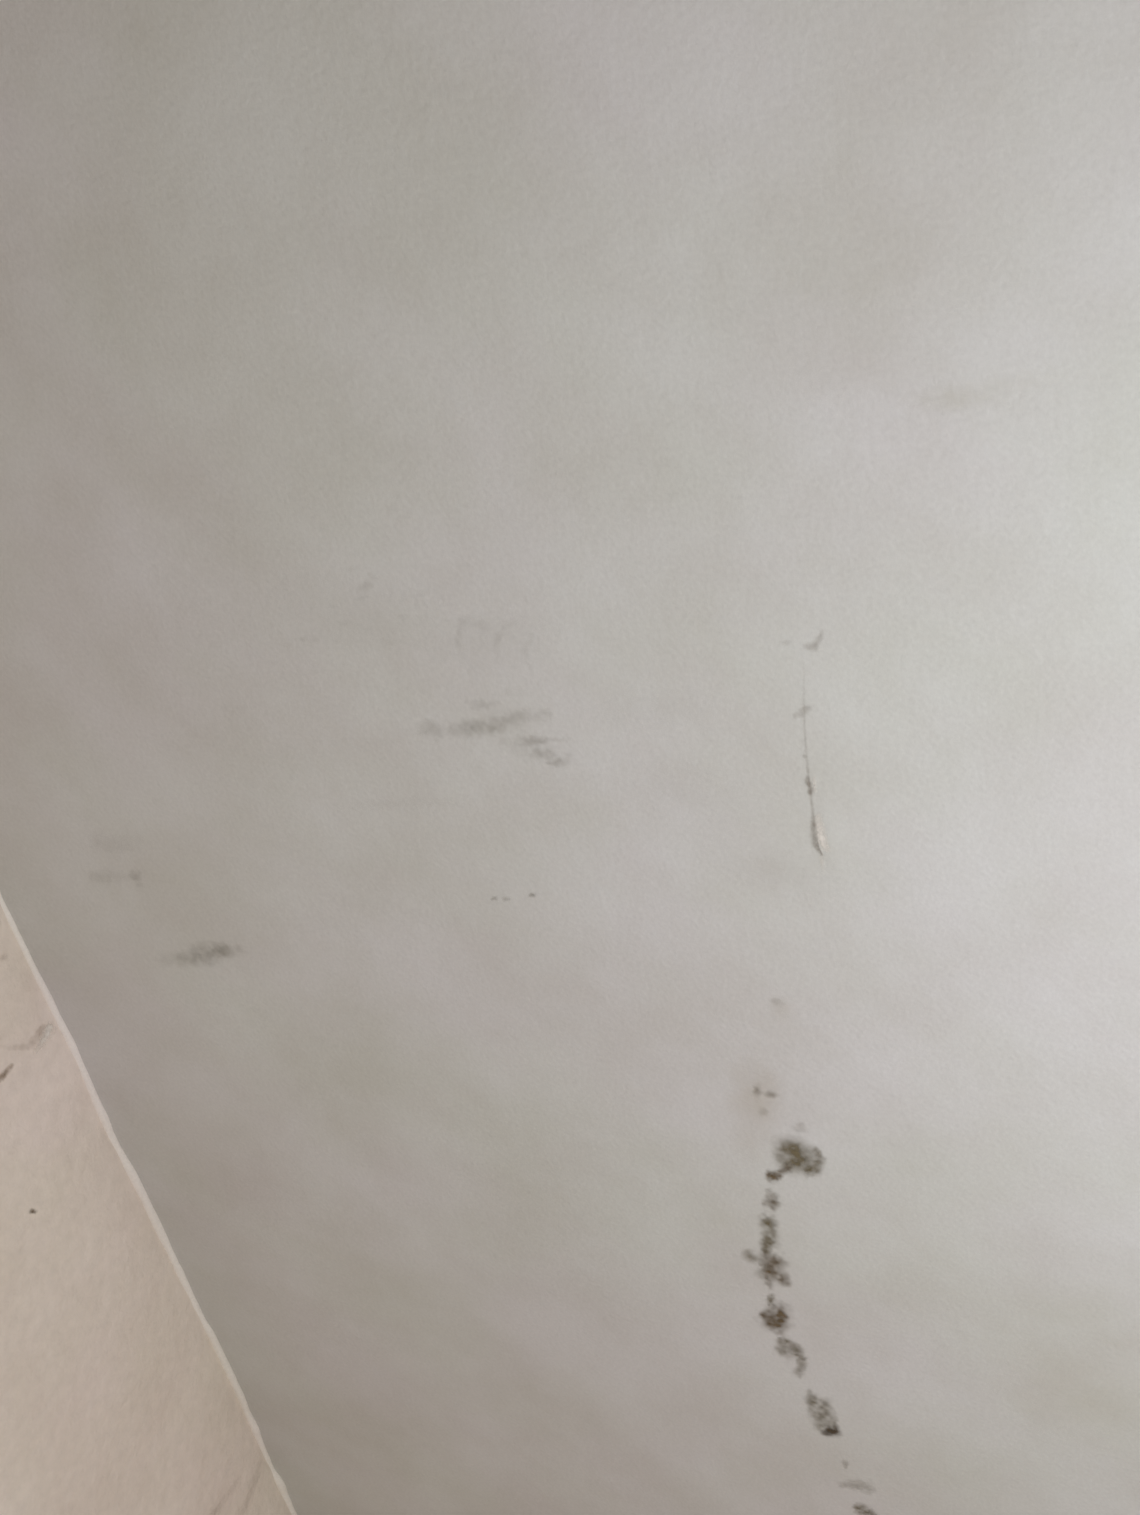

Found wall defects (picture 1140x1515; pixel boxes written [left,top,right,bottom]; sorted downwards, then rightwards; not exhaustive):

crack [817,824,826,848]
water stain [767,1143,820,1180]
water stain [763,1201,784,1282]
water stain [761,1299,787,1342]